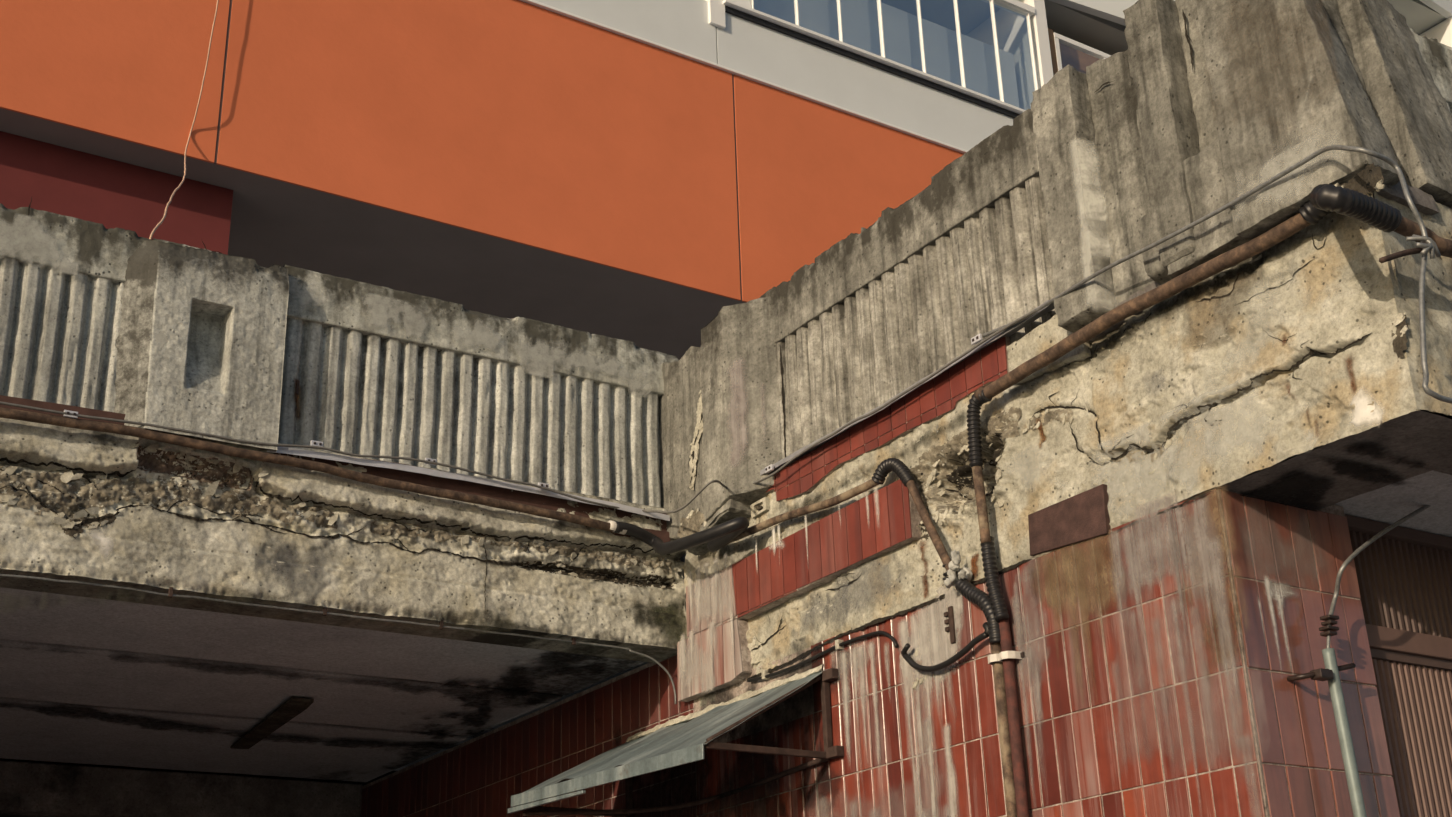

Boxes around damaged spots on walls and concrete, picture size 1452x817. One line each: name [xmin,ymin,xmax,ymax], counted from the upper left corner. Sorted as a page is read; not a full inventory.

crack [1182,9,1193,70]
crack [1031,233,1371,466]
water stain [0,704,247,737]
spalling [0,442,338,537]
crack [0,457,677,607]
water stain [112,651,606,749]
water stain [634,556,733,711]
water stain [628,587,963,817]
spalling [910,407,1074,541]
water stain [1012,568,1040,756]
water stain [1098,382,1425,742]